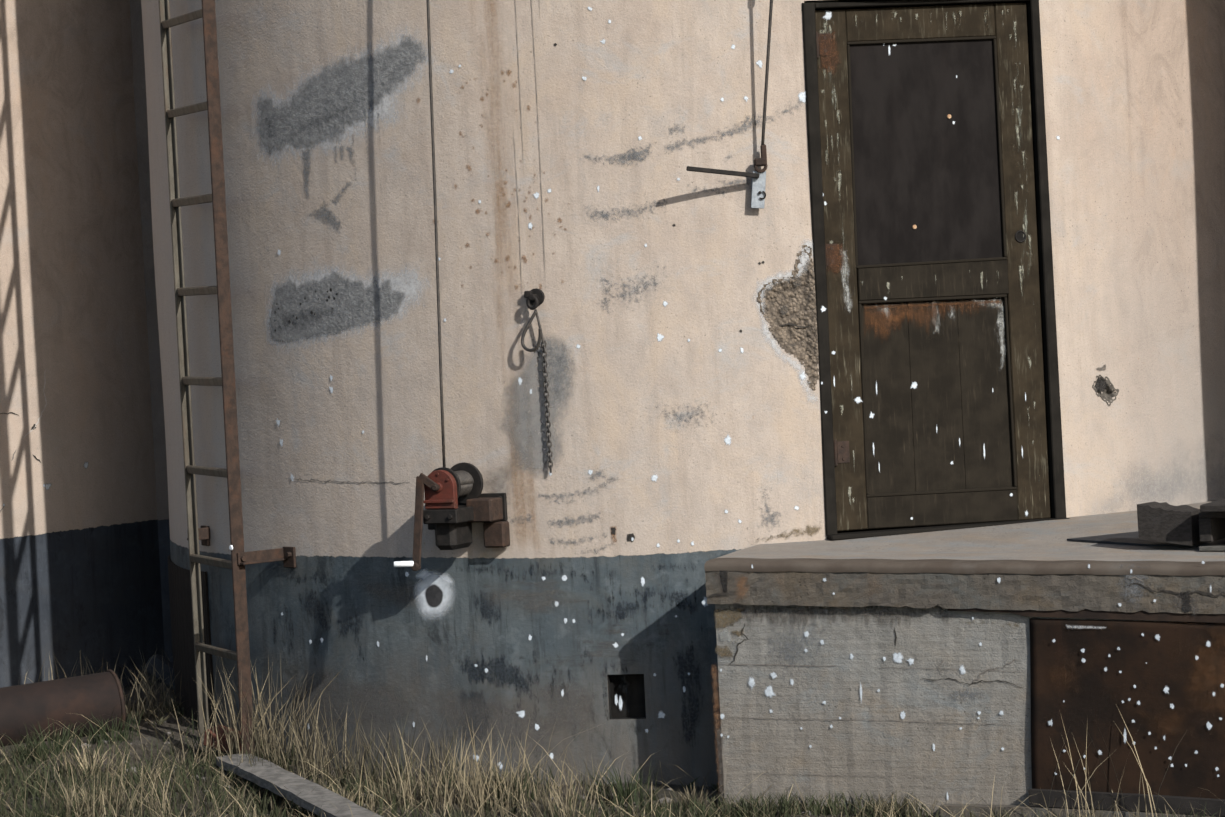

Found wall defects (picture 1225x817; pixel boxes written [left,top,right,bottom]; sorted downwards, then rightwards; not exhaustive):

rust [495,0,546,288]
peeling [830,241,851,311]
spalling [756,242,835,400]
peeling [980,272,1004,360]
leakage [507,339,571,470]
spalling [1093,365,1119,406]
crack [1124,575,1225,602]
crack [874,628,1026,689]
rust [1191,648,1225,715]
crack [727,717,1022,725]